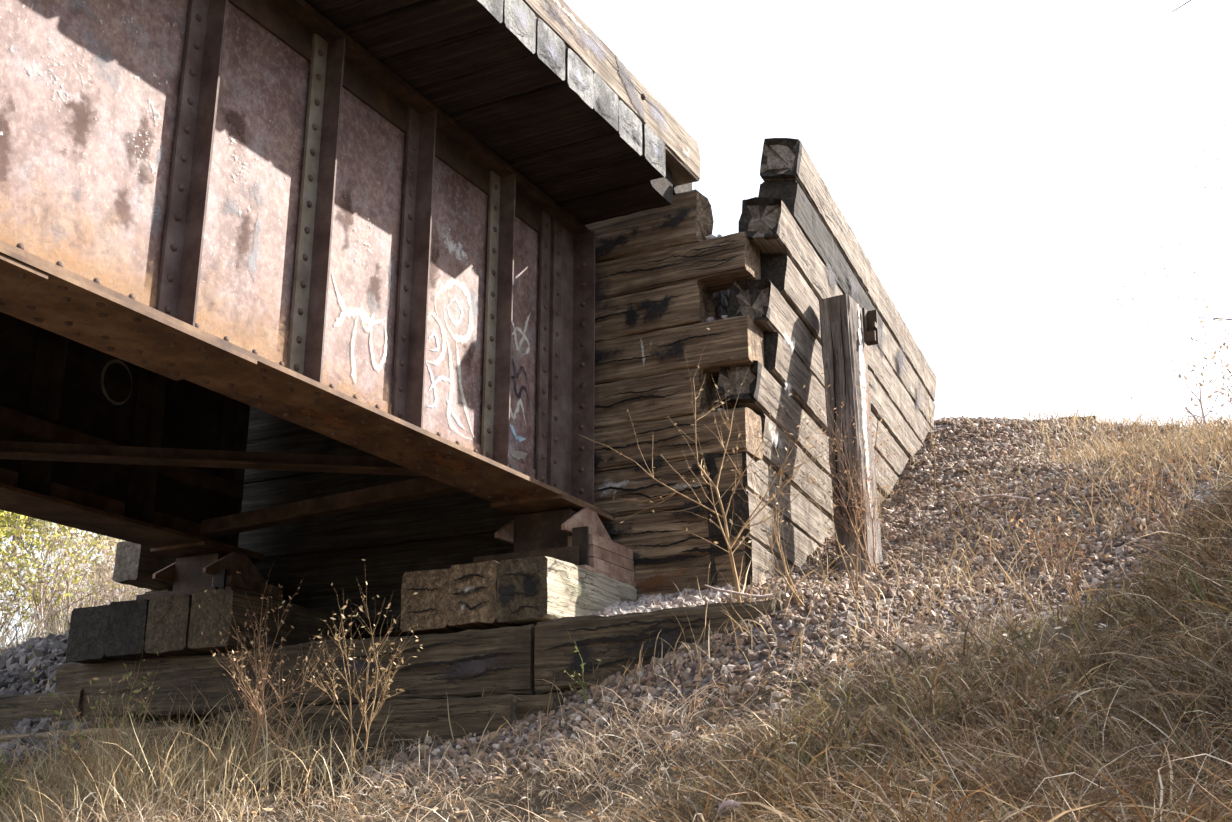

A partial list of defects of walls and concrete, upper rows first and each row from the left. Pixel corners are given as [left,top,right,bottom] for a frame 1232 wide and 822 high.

rust [0,103,15,180]
rust [67,95,92,144]
rust [127,118,152,182]
rust [225,112,246,143]
rust [0,192,157,308]
rust [237,215,250,266]
rust [337,183,354,247]
rust [370,266,381,301]
rust [195,290,288,368]